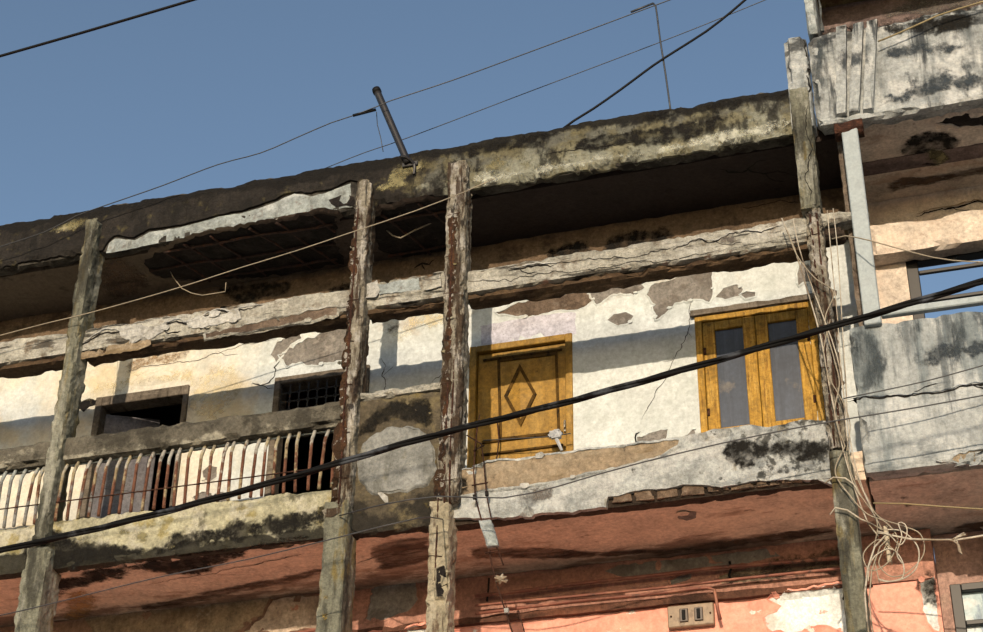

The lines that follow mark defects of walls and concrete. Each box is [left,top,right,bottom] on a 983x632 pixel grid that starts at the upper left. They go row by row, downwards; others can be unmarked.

water stain [865,0,983,57]
water stain [884,70,983,103]
water stain [537,99,788,173]
spalling [929,108,983,130]
crack [917,199,983,217]
peeling [494,272,757,322]
spalling [81,336,151,359]
spalling [106,184,359,518]
crack [634,303,691,442]
spalling [363,195,697,632]
water stain [723,440,829,468]
water stain [24,506,325,620]